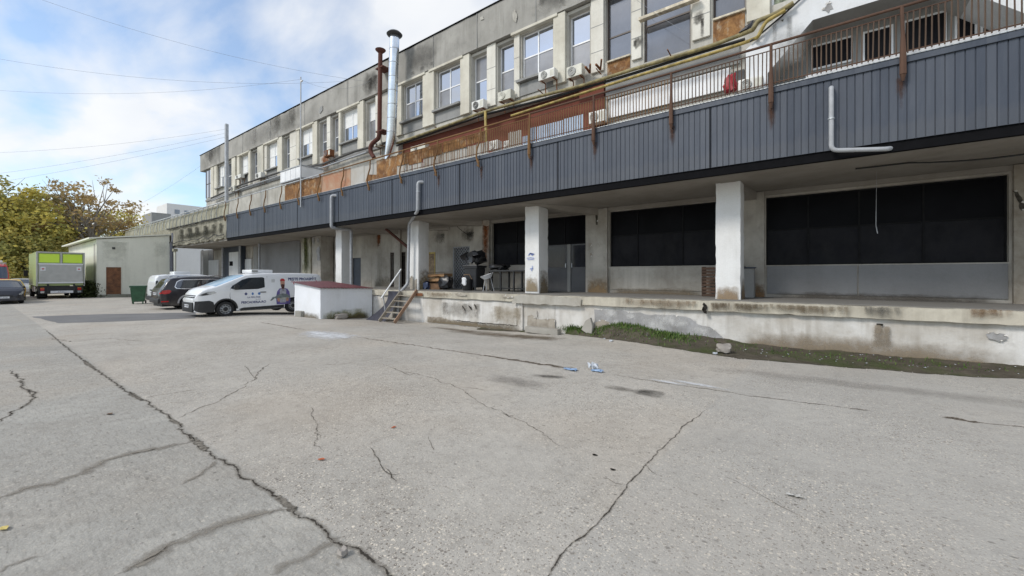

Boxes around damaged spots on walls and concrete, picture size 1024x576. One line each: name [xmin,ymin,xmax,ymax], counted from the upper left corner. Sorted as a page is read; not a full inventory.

crack [0,373,36,421]
crack [47,330,392,576]
crack [381,340,573,444]
crack [548,375,862,576]